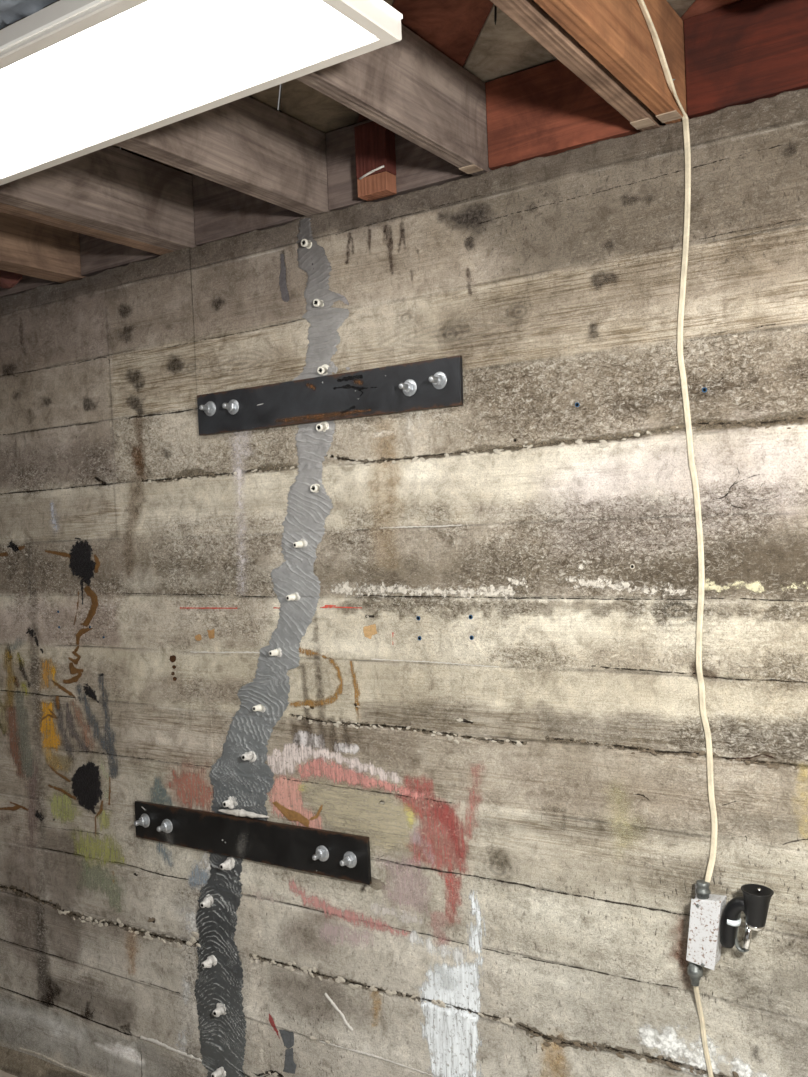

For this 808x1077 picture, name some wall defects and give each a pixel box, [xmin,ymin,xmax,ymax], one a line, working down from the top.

crack [256,956,724,1077]